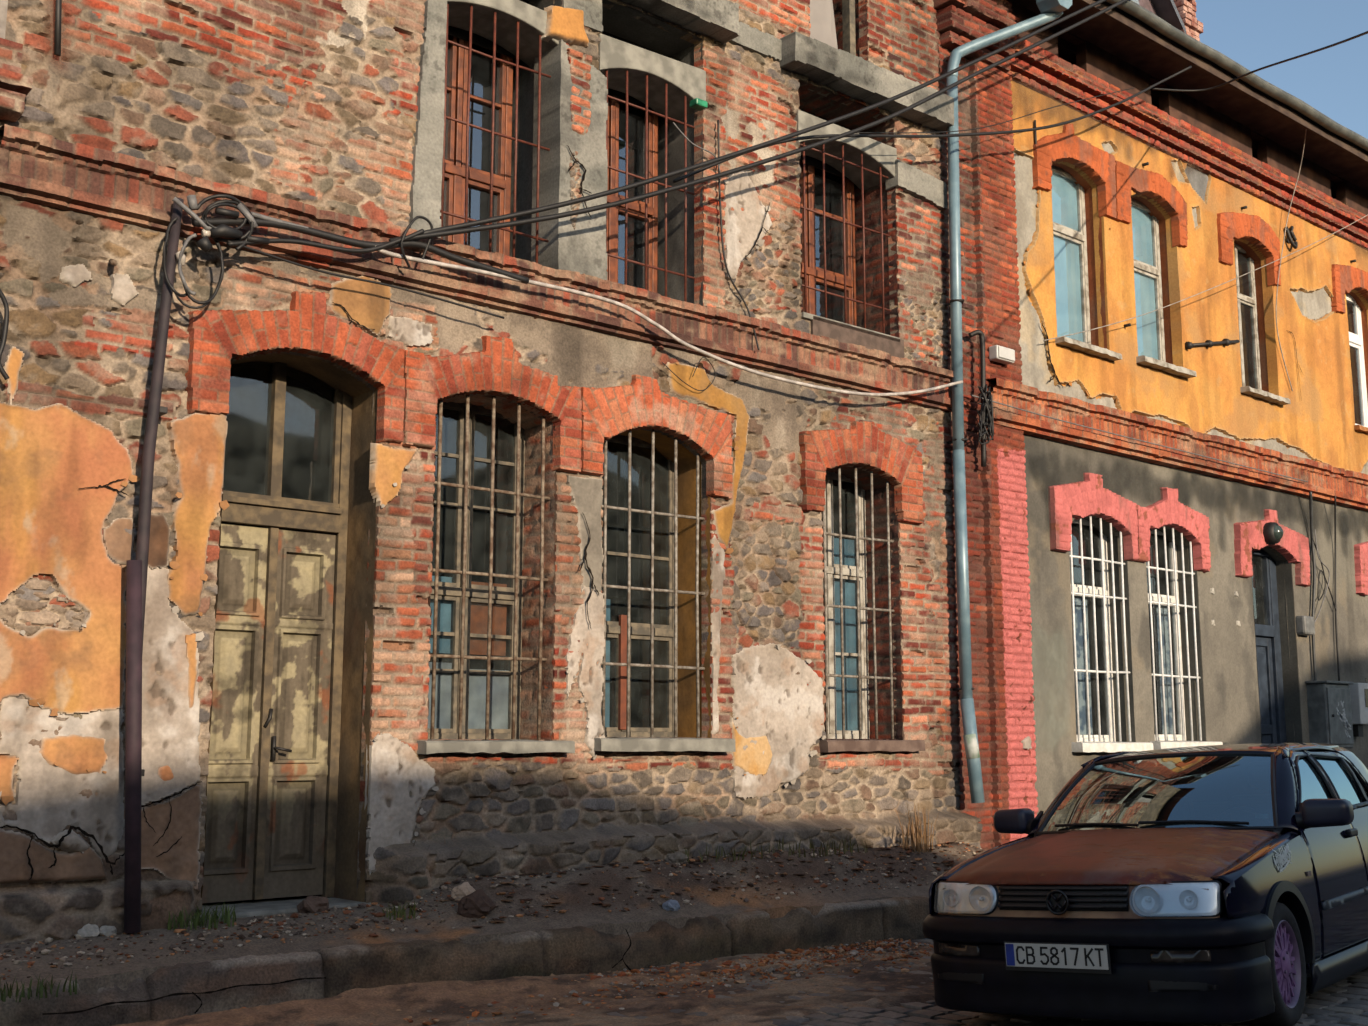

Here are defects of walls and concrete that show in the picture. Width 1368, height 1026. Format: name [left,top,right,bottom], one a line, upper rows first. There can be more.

crack [567,145,592,217]
peeling [723,171,772,280]
spalling [1171,162,1208,228]
peeling [329,276,433,347]
spalling [1013,153,1118,409]
spalling [1291,287,1333,321]
crack [79,479,129,496]
peeling [0,345,230,859]
crack [579,512,599,628]
peeling [664,362,826,800]
crack [0,782,199,880]
crack [42,977,326,1015]